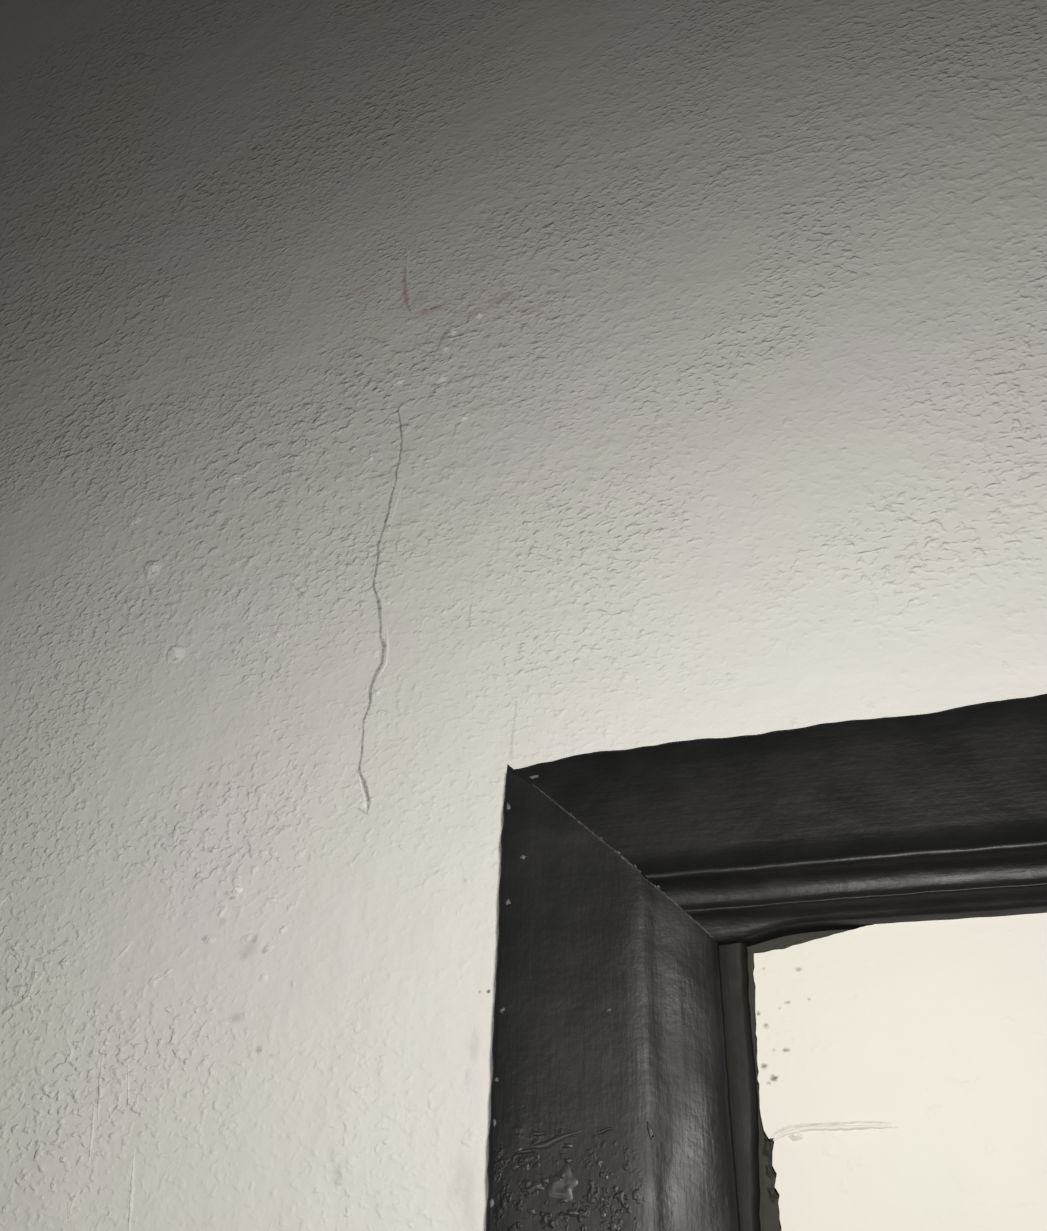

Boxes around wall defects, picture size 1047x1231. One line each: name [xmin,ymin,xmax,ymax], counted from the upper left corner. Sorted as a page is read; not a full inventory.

crack [377,485,402,559]
crack [369,600,391,703]
crack [357,747,368,808]